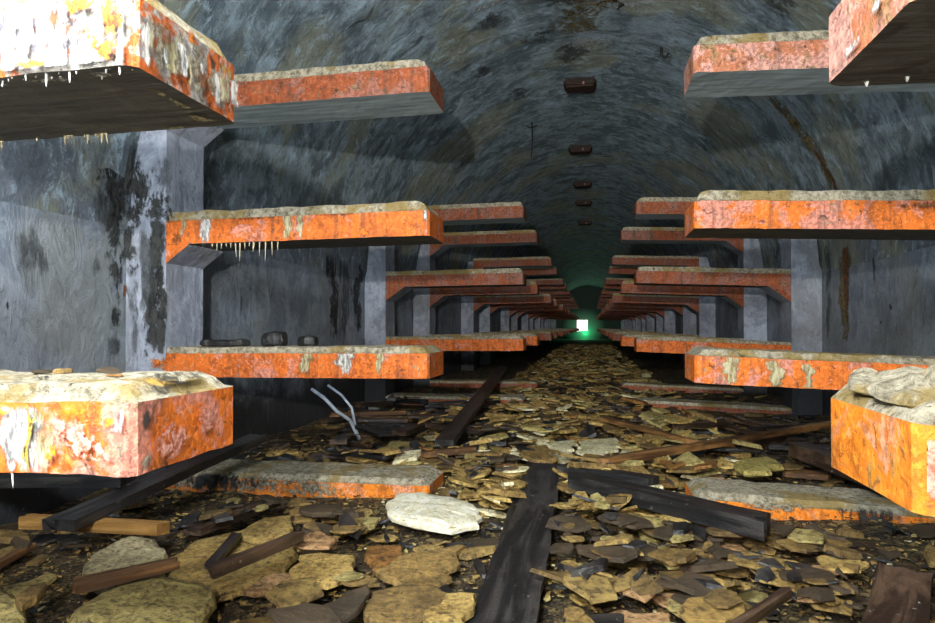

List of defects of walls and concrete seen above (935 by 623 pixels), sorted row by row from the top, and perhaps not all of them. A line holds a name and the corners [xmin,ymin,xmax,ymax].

rust [64,0,123,59]
rust [14,60,44,68]
water stain [19,229,48,271]
water stain [94,142,172,356]
water stain [200,219,212,242]
water stain [283,215,305,239]